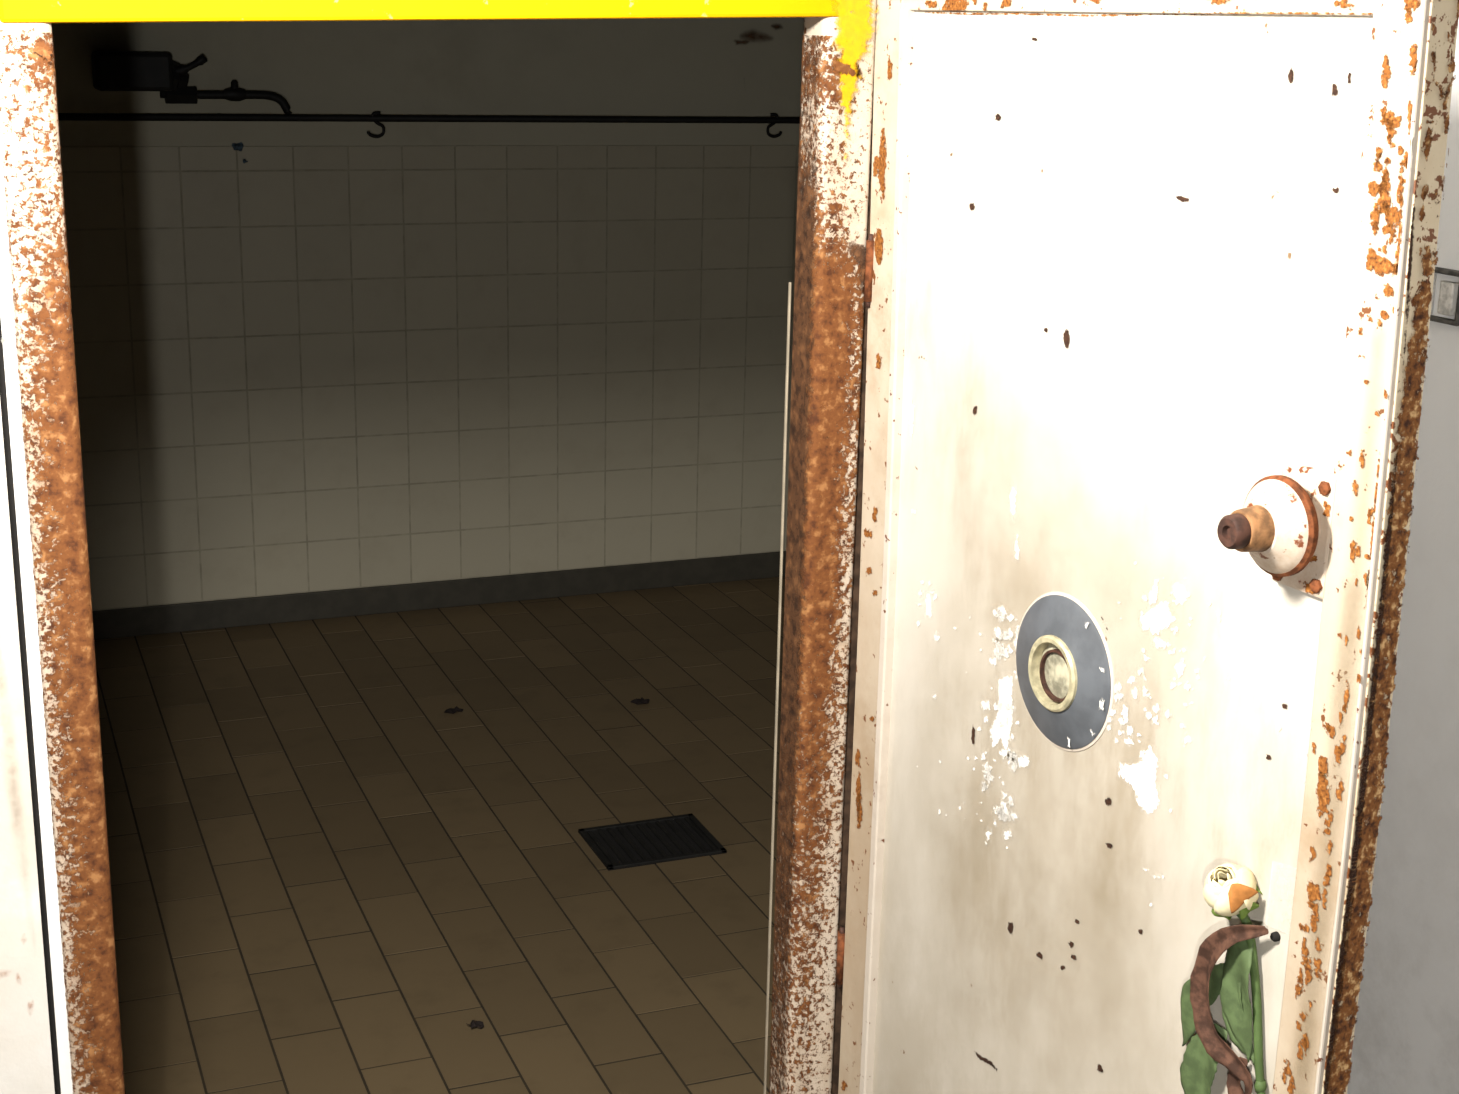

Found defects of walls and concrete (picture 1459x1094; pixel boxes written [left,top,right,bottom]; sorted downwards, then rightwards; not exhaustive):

rust [925,0,1372,17]
peeling [1044,328,1070,348]
rust [0,32,125,1094]
rust [769,35,892,1094]
peeling [917,580,1029,849]
peeling [1090,577,1205,814]
rust [1281,0,1459,1094]